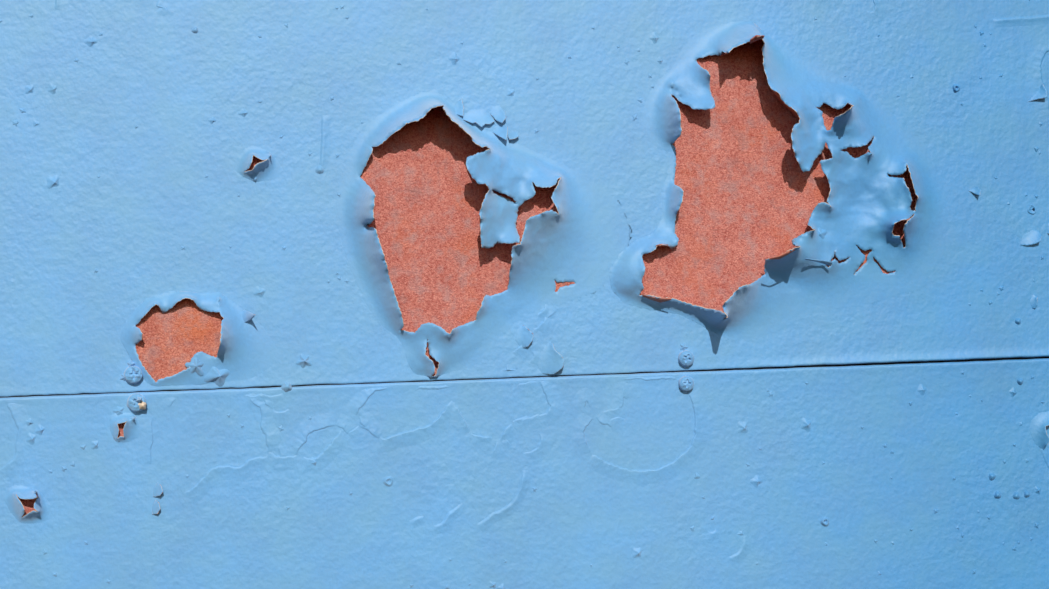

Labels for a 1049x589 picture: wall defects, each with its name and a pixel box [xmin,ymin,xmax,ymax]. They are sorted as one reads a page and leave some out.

peeling [235,145,284,182]
peeling [335,21,948,378]
peeling [120,291,276,387]
peeling [110,397,143,442]
peeling [1029,411,1049,450]
peeling [4,485,51,524]